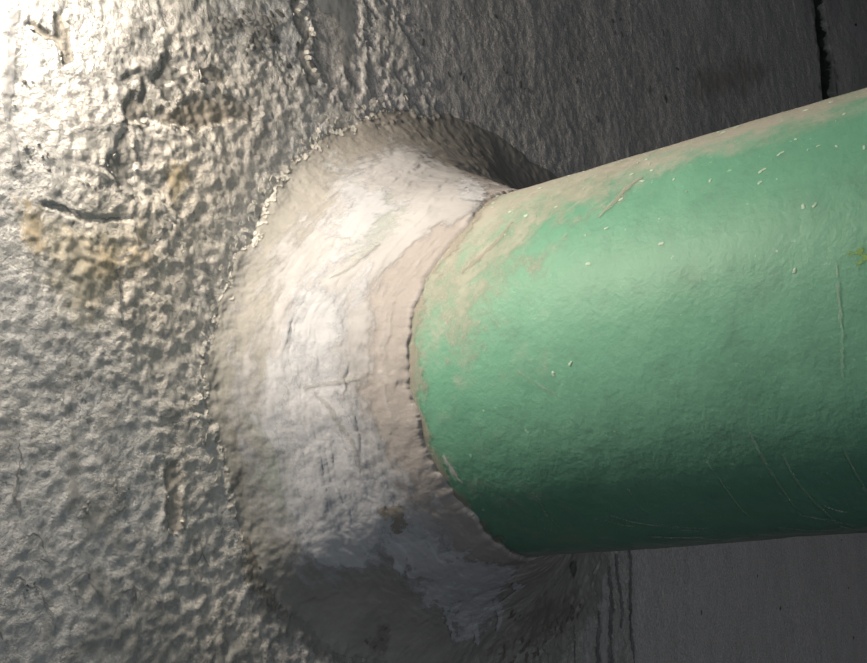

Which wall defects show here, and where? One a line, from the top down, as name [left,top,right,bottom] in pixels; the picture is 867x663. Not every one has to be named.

water stain [1,0,21,180]
peeling [76,46,265,199]
crack [811,0,838,100]
peeling [190,0,489,563]
water stain [498,550,635,663]